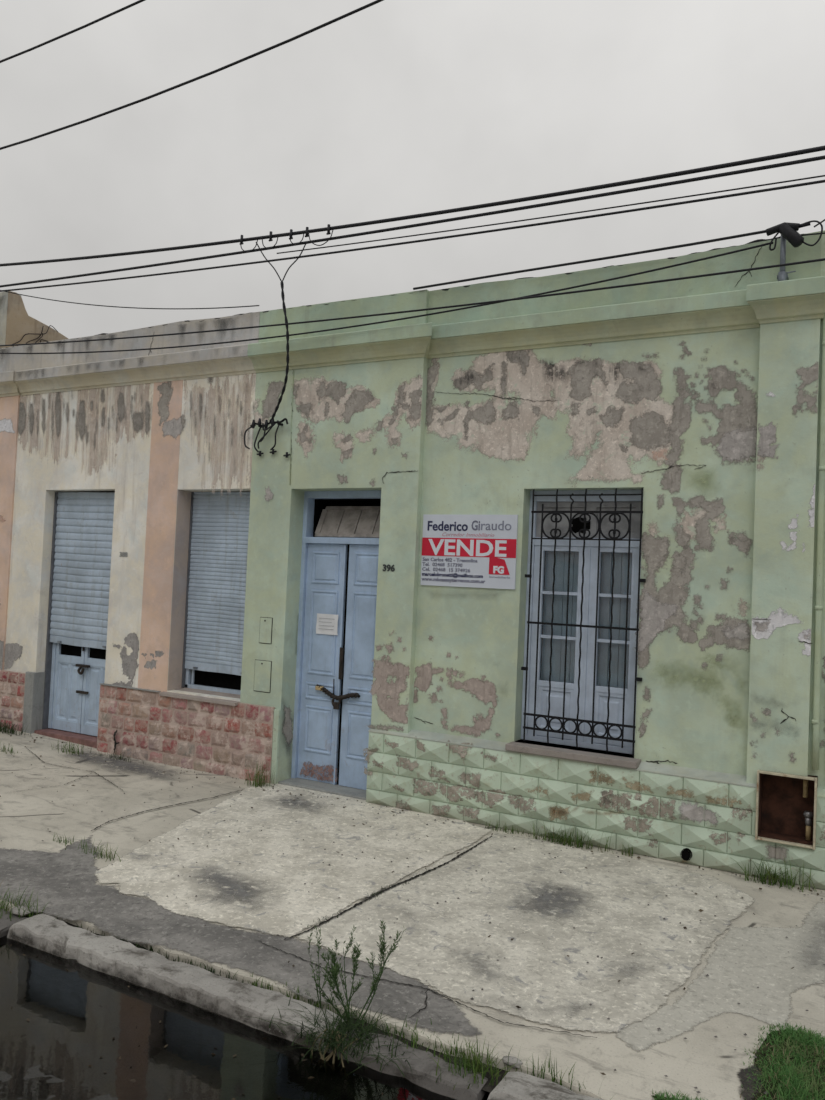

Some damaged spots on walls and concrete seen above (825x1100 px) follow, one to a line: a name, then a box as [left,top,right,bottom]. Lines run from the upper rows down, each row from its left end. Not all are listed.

peeling [0,341,819,670]
peeling [113,633,164,687]
peeling [364,630,548,820]
peeling [639,686,652,737]
peeling [300,761,337,782]
peeling [550,769,693,848]
peeling [706,795,752,845]
crack [260,836,597,1038]